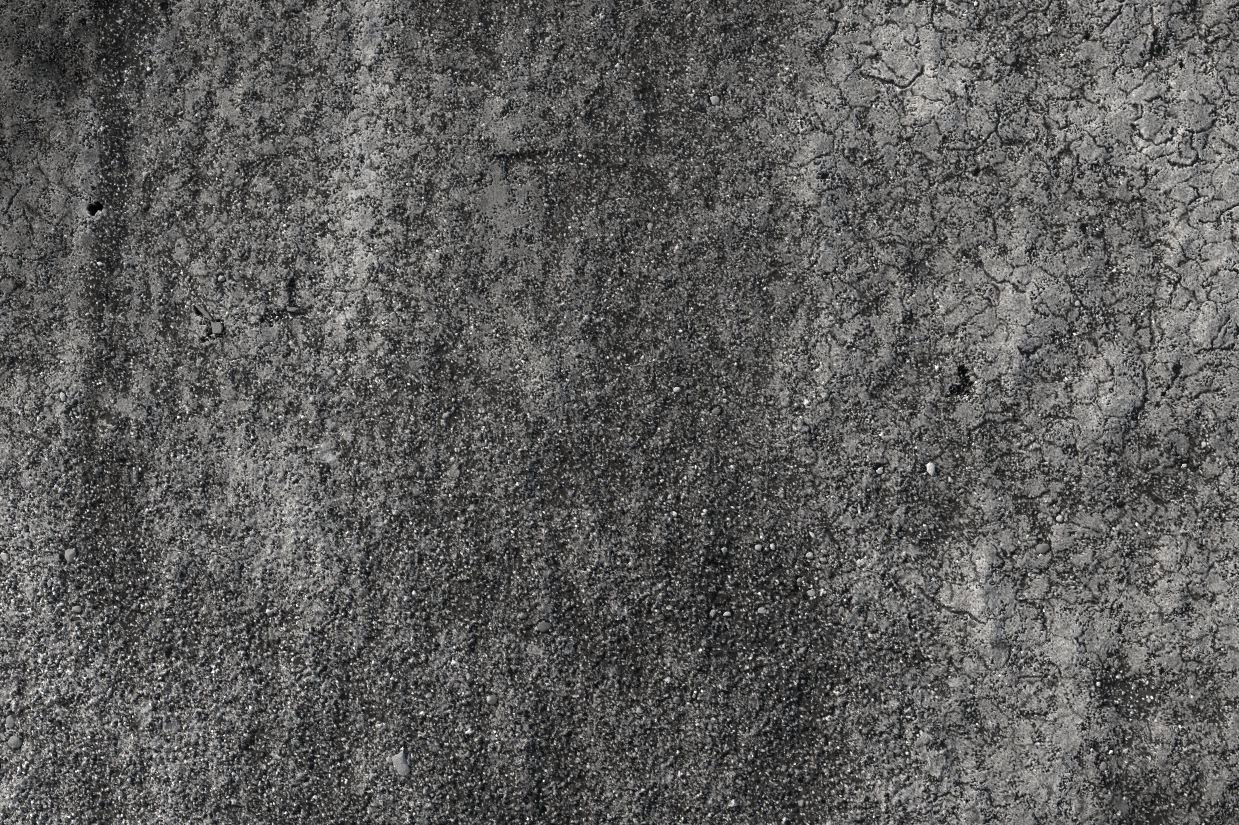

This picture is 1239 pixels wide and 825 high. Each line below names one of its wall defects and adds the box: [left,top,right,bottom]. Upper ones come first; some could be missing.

crack [816,0,844,65]
crack [860,0,1239,228]
crack [813,115,927,319]
crack [978,262,1047,357]
crack [1100,233,1239,427]
crack [968,415,1081,505]
crack [920,587,986,671]
crack [1016,599,1048,627]
crack [1018,661,1063,679]
crack [1180,646,1213,665]
crack [1175,563,1223,608]
crack [932,783,1007,809]